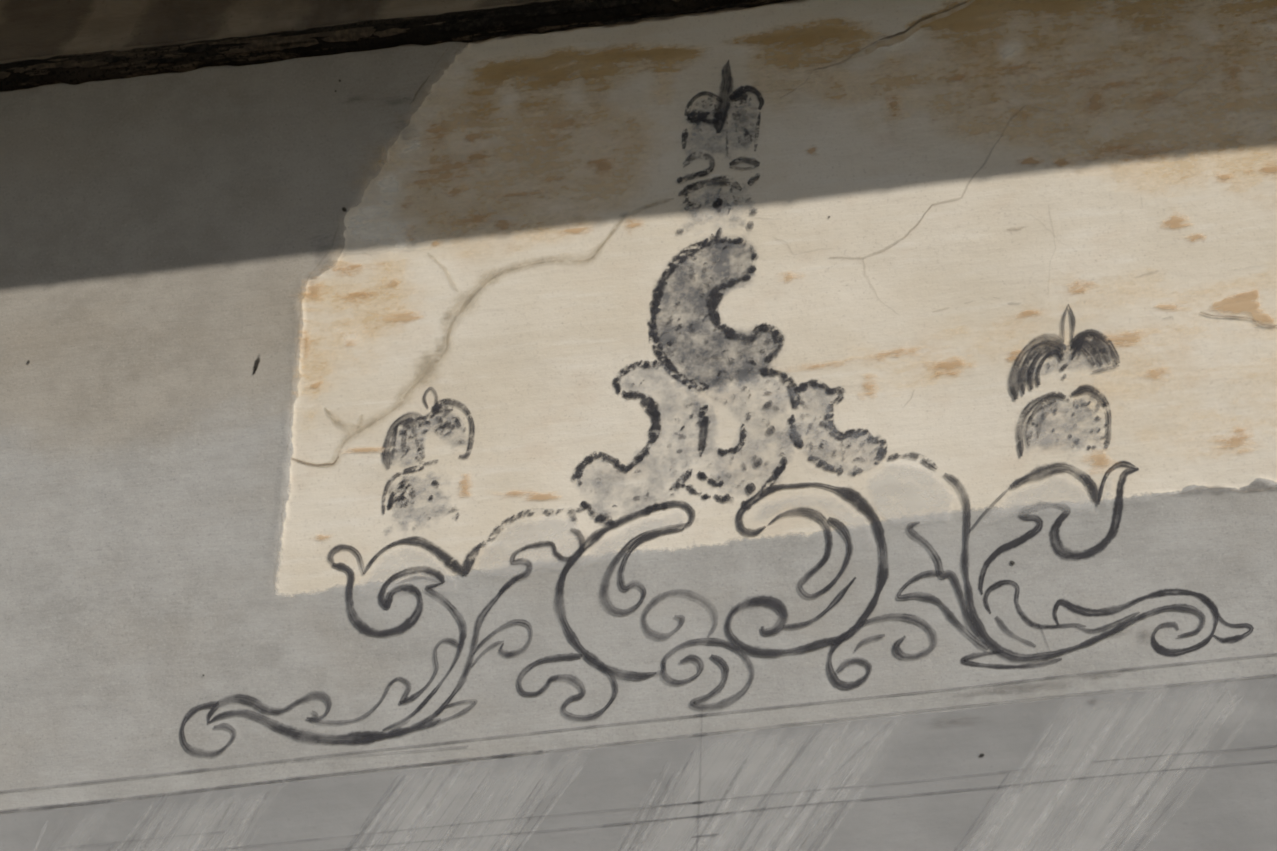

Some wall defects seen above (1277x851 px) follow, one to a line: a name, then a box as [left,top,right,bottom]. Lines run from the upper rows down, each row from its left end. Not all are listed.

peeling [0,6,534,79]
damp [470,46,698,113]
damp [743,19,870,69]
damp [909,0,1194,48]
crack [415,270,508,384]
flaking render [276,0,1277,595]